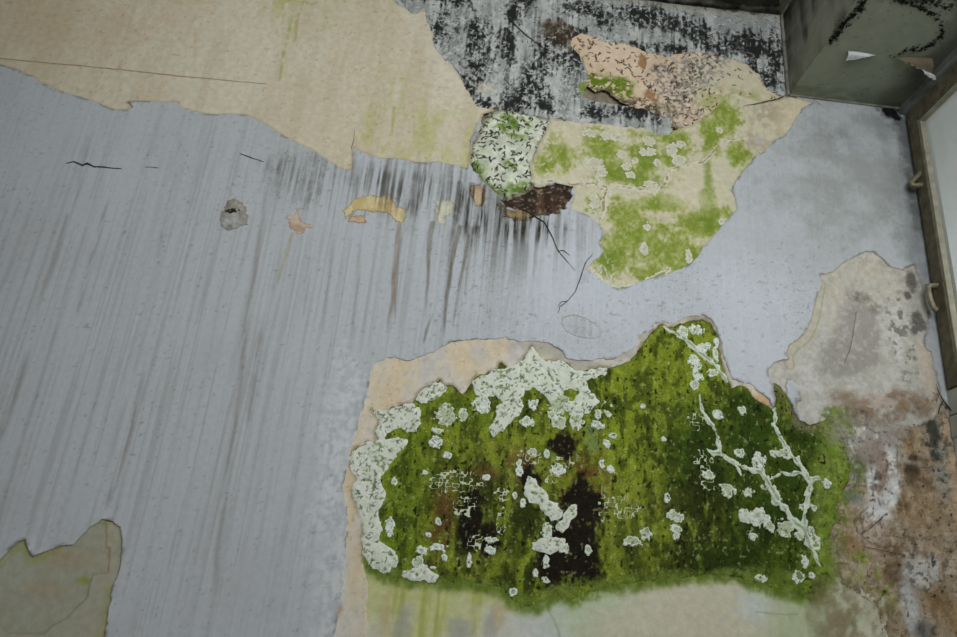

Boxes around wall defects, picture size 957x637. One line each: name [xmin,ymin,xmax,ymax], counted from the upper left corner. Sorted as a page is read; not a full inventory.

flaking render [0,0,494,170]
damp [399,0,806,135]
flaking render [570,33,786,129]
damp [828,0,867,45]
damp [882,0,957,58]
crack [66,161,122,169]
damp [455,187,548,240]
spalling [469,183,573,222]
crack [523,209,592,312]
flaking render [768,251,945,434]
damp [818,390,957,637]
flaking render [0,519,122,637]